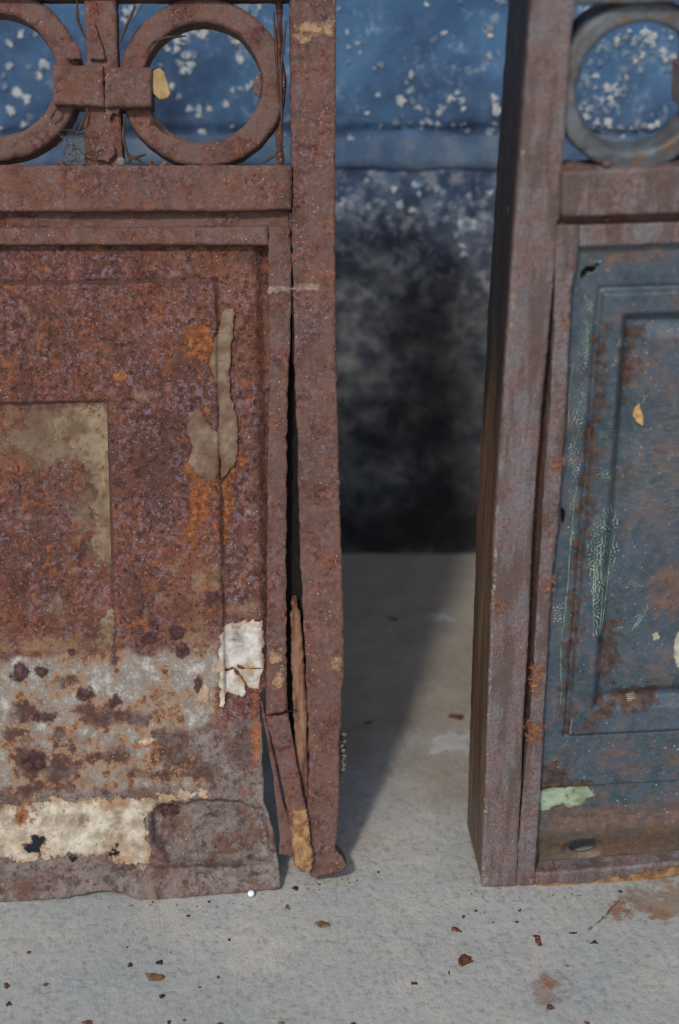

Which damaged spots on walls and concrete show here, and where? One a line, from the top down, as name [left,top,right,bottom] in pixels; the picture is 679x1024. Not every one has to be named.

peeling [292,7,362,64]
peeling [187,308,238,482]
corrosion [528,316,659,735]
corrosion [9,661,48,681]
corrosion [31,711,58,723]
corrosion [76,687,95,701]
corrosion [139,626,190,659]
spalling [196,619,285,715]
corrosion [20,750,46,771]
peeling [539,761,595,811]
corrosion [14,799,40,825]
peeling [0,786,208,872]